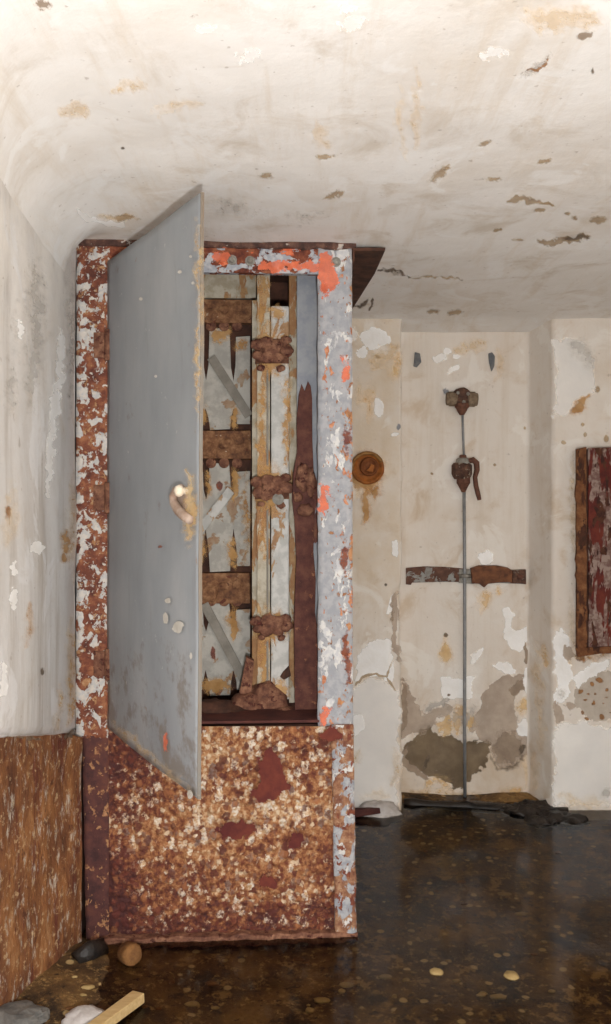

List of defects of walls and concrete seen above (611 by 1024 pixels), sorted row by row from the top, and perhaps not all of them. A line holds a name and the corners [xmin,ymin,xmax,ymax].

spalling [525,58,548,76]
crack [377,268,463,281]
peeling [551,337,596,419]
corrosion [352,463,385,523]
crack [355,664,396,691]
spalling [355,583,528,790]
peeling [551,627,611,806]